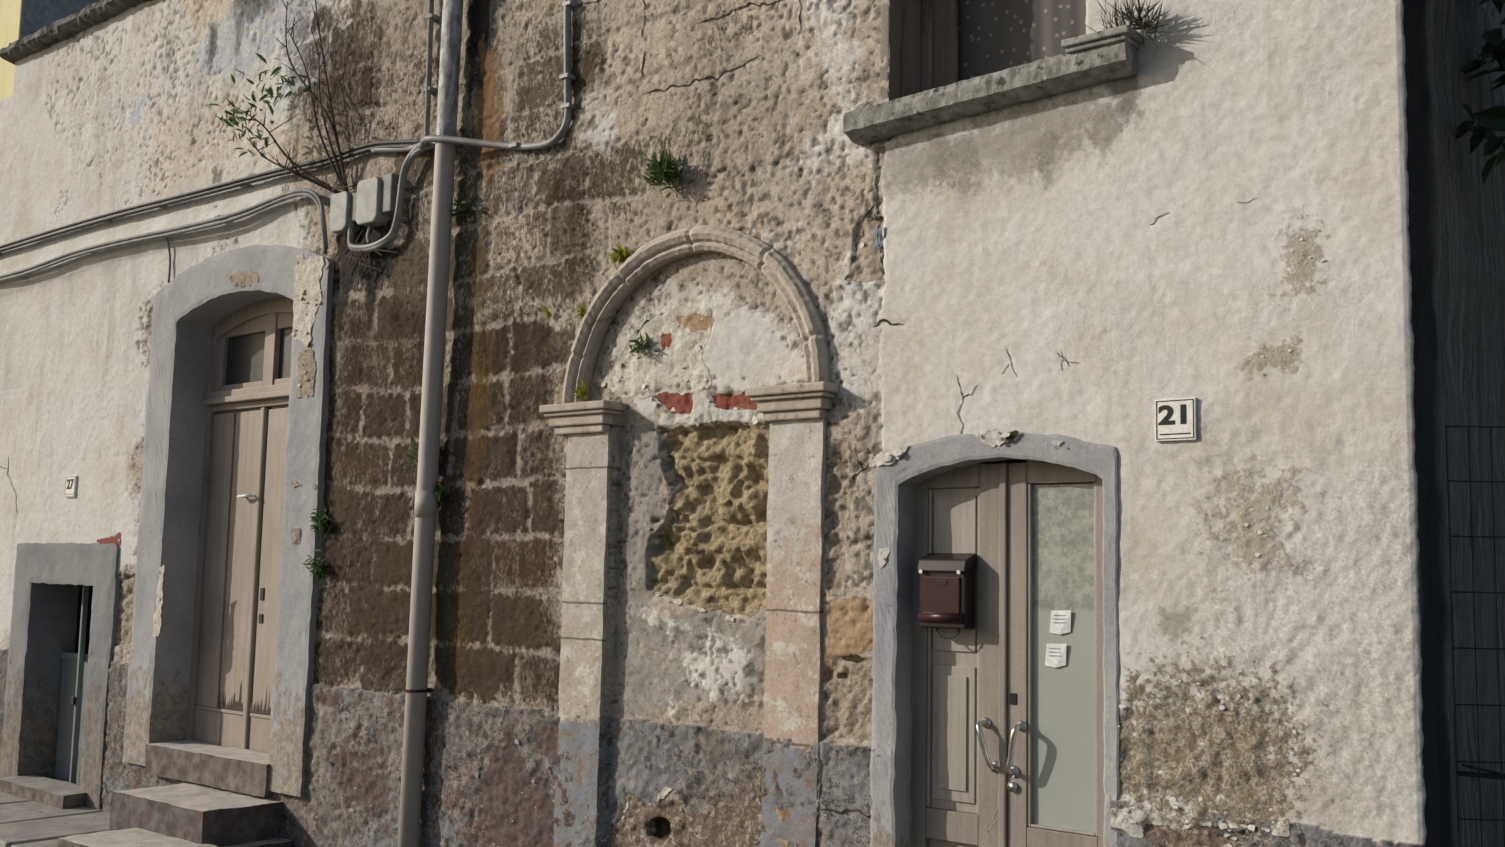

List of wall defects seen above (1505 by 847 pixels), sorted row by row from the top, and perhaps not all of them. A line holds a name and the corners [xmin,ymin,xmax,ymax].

crack [641,0,760,94]
crack [696,0,802,28]
peeling [1267,214,1328,300]
peeling [291,254,324,399]
crack [956,349,1016,434]
peeling [1240,332,1301,380]
spalling [598,303,770,621]
spalling [1110,636,1329,847]
peeling [600,773,793,847]